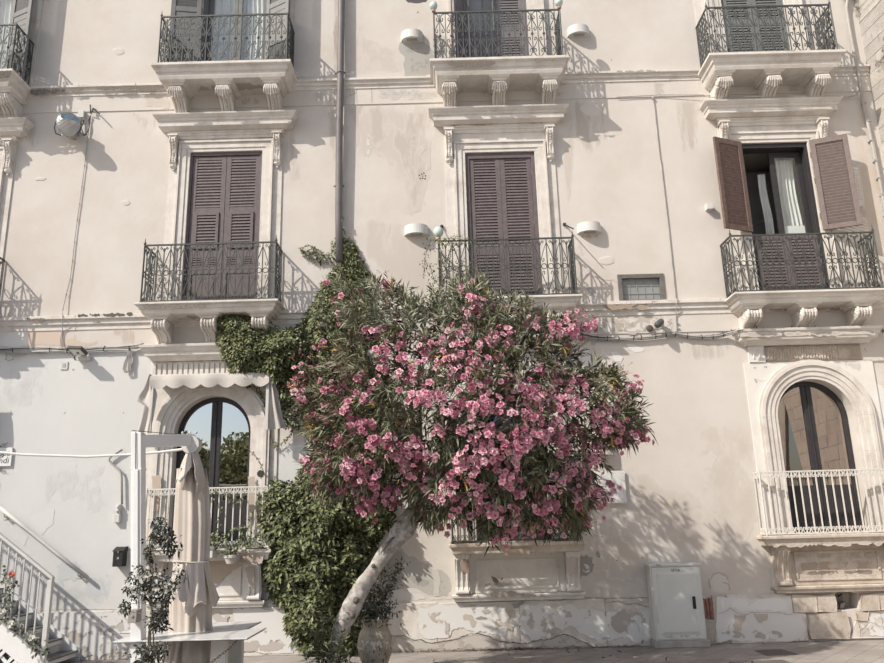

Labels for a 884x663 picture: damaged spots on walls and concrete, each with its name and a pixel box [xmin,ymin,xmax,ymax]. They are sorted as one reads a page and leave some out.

peeling [39,611,131,659]
spalling [365,605,593,663]
peeling [595,609,646,640]